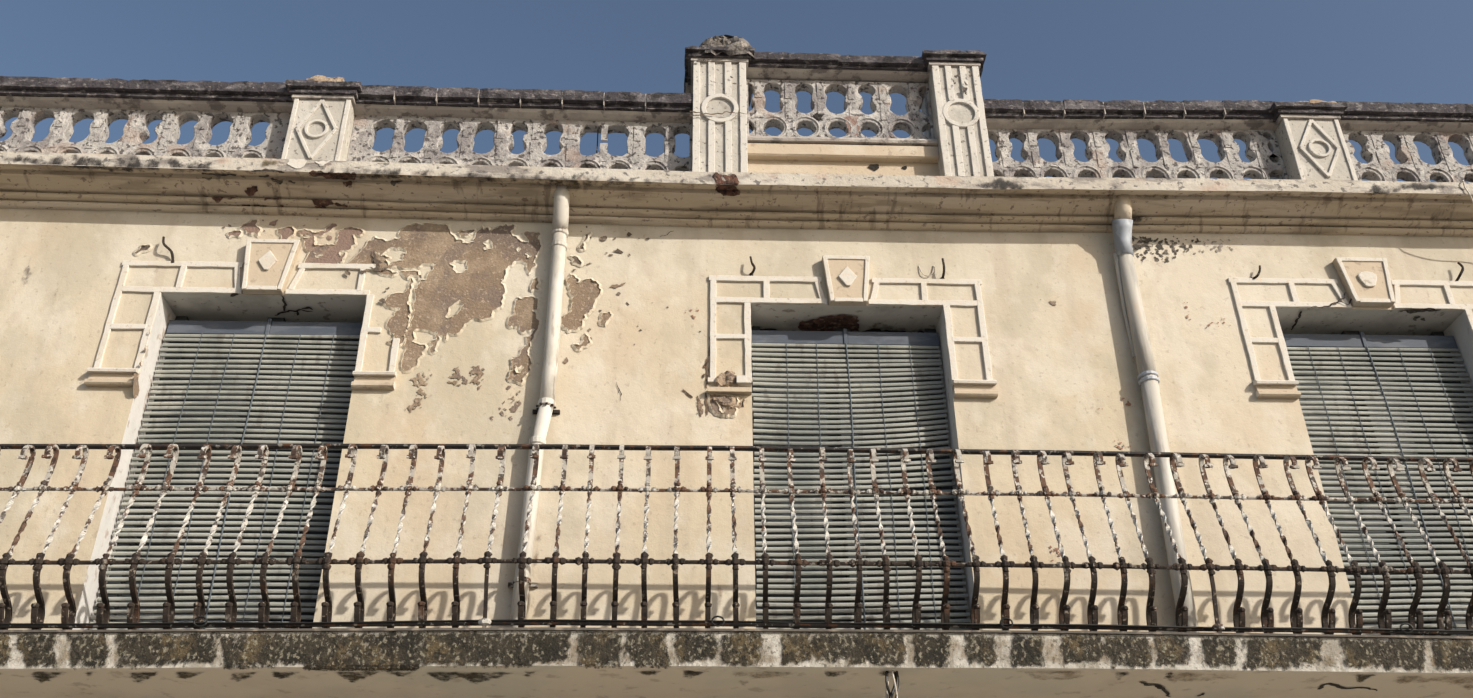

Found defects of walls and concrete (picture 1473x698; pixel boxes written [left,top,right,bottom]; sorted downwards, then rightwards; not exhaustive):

leakage [1132,217,1243,262]
peeling [212,159,544,420]
peeling [561,226,650,364]
flaking render [697,394,740,418]
leakage [0,630,1473,689]